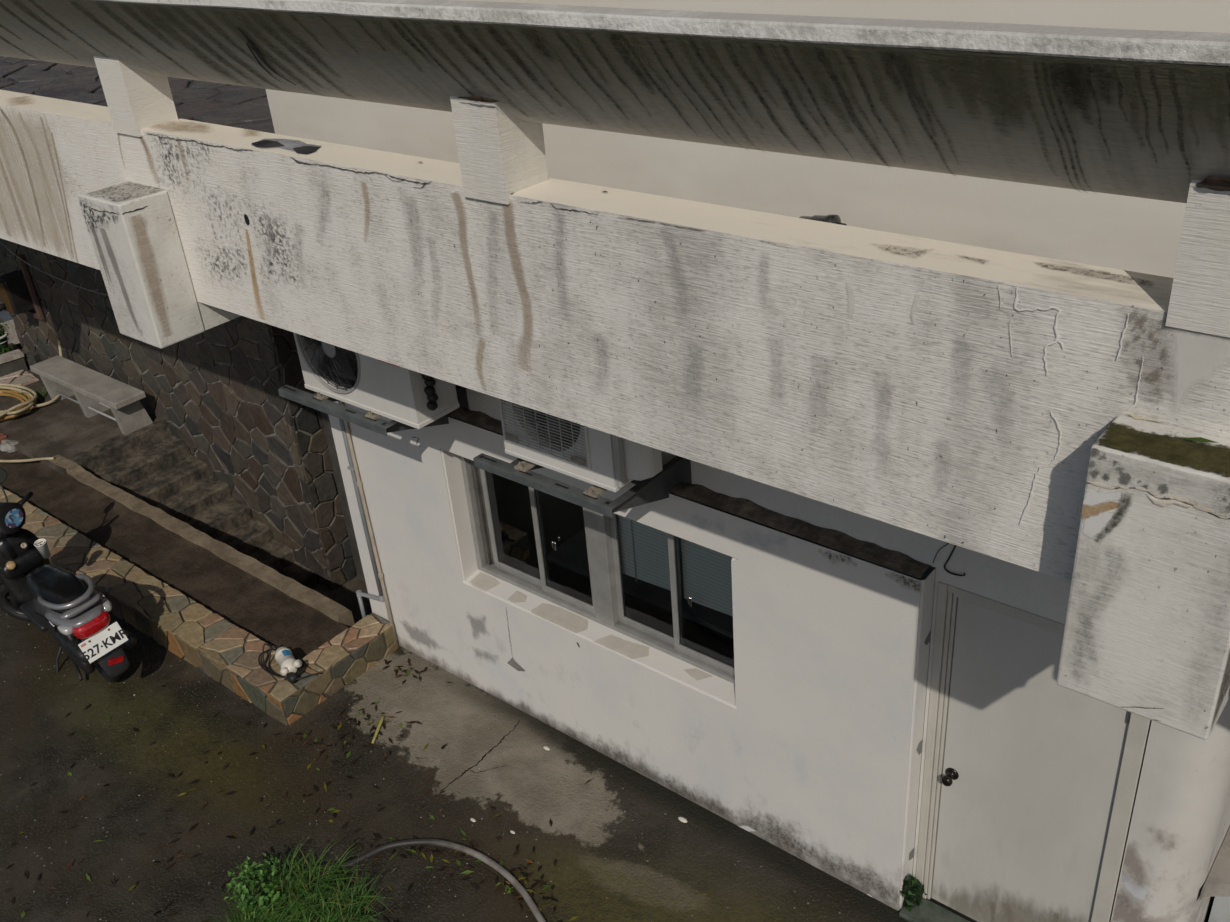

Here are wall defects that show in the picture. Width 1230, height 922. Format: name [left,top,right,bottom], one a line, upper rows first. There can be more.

leakage [71,1,343,93]
leakage [358,21,1230,192]
rust [246,231,260,308]
leakage [259,218,298,272]
leakage [453,194,477,313]
leakage [491,204,531,353]
crack [998,285,1064,375]
leakage [1126,313,1230,400]
peeling [1081,481,1228,538]
crack [1086,483,1230,519]
crack [440,720,520,791]
leakage [750,818,898,902]